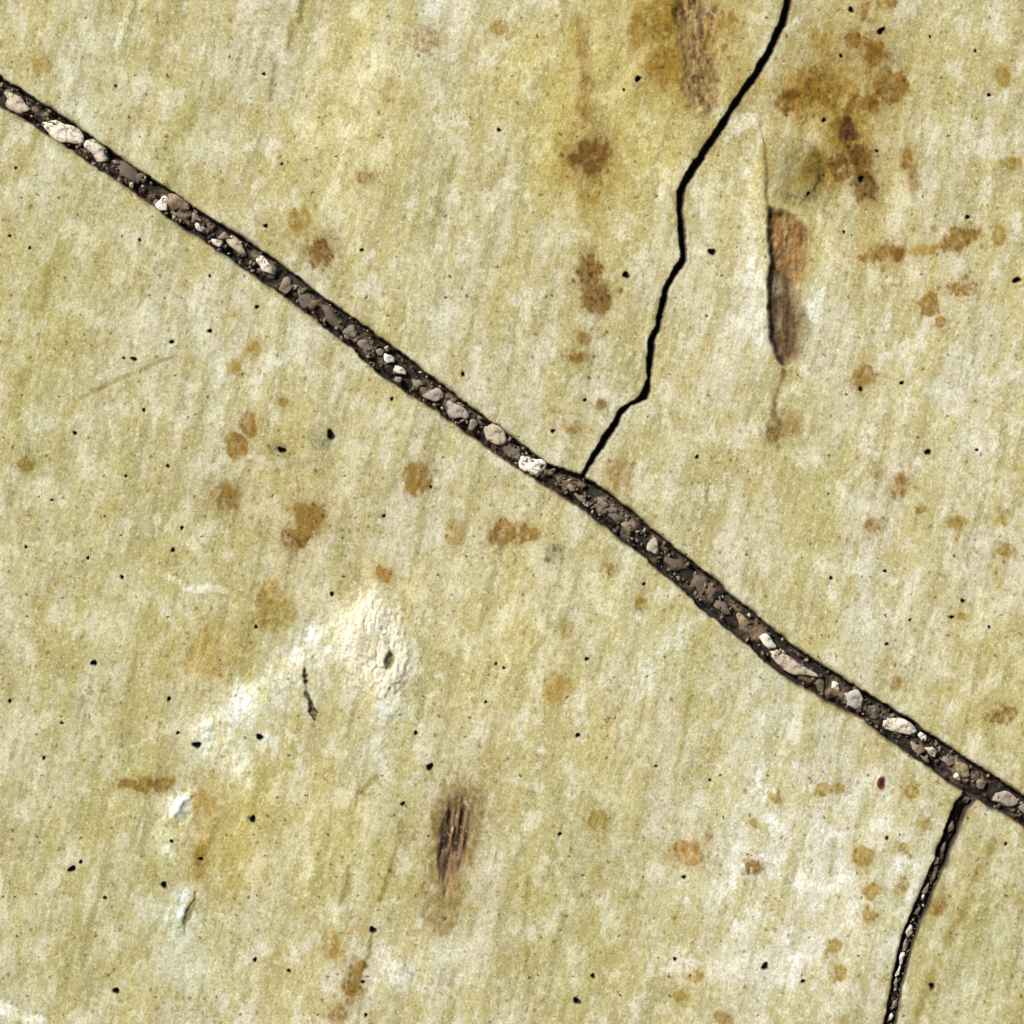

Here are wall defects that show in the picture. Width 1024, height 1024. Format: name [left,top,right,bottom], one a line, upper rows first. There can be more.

rust [618,0,714,155]
rust [713,0,1016,334]
rust [518,11,659,370]
crack [555,475,567,486]
crack [635,528,648,538]
crack [947,821,955,833]
crack [905,924,913,938]
crack [898,952,906,966]